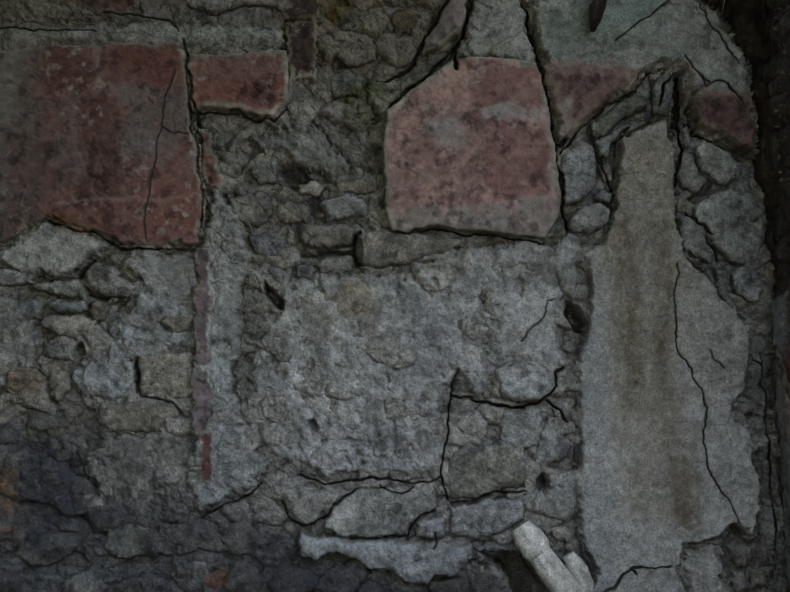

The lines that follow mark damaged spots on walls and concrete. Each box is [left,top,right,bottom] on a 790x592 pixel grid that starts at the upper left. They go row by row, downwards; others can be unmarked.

crack [0,25,96,33]
crack [51,11,287,251]
peeling [282,0,320,88]
spalling [329,0,388,123]
crack [520,0,744,234]
spalling [0,247,216,505]
crack [138,367,182,414]
crack [282,367,568,537]
crack [673,263,740,524]